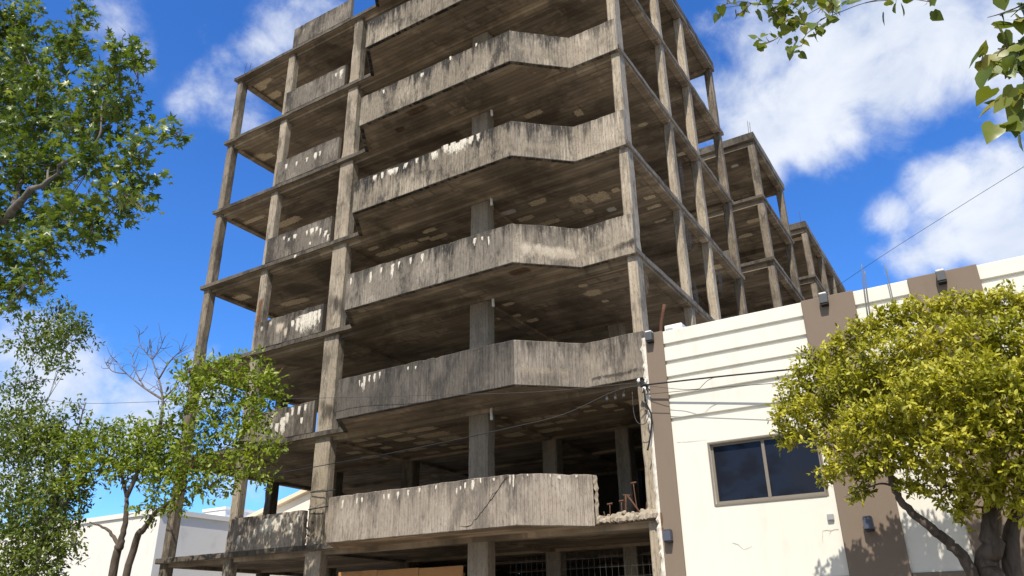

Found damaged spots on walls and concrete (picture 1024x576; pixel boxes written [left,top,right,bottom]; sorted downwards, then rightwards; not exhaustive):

damp [310,505,338,531]
spalling [593,475,660,525]